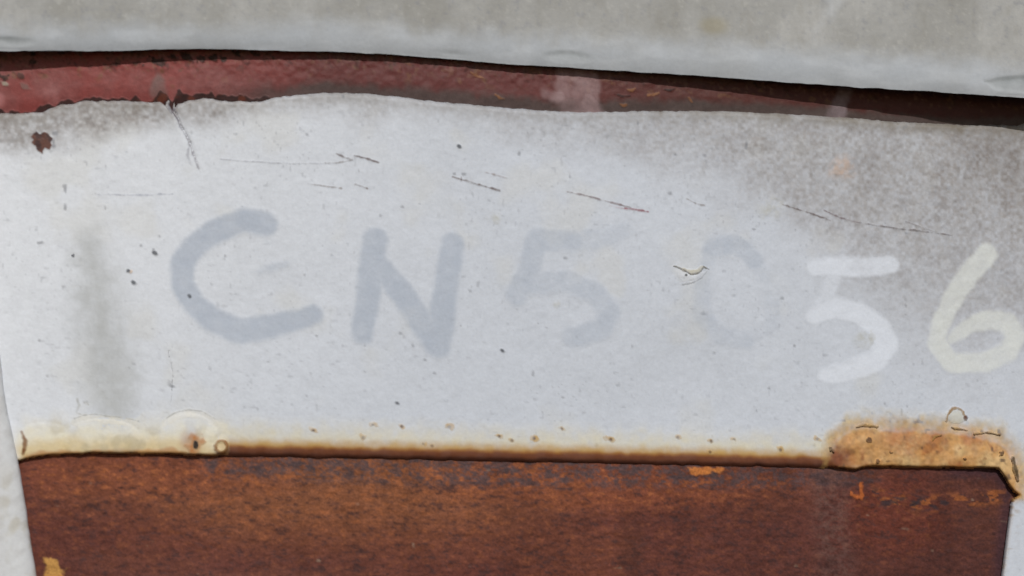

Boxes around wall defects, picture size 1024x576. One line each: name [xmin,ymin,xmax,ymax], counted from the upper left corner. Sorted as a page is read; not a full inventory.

crack [166,101,202,174]
rust [10,401,1024,506]
rust [41,555,68,576]